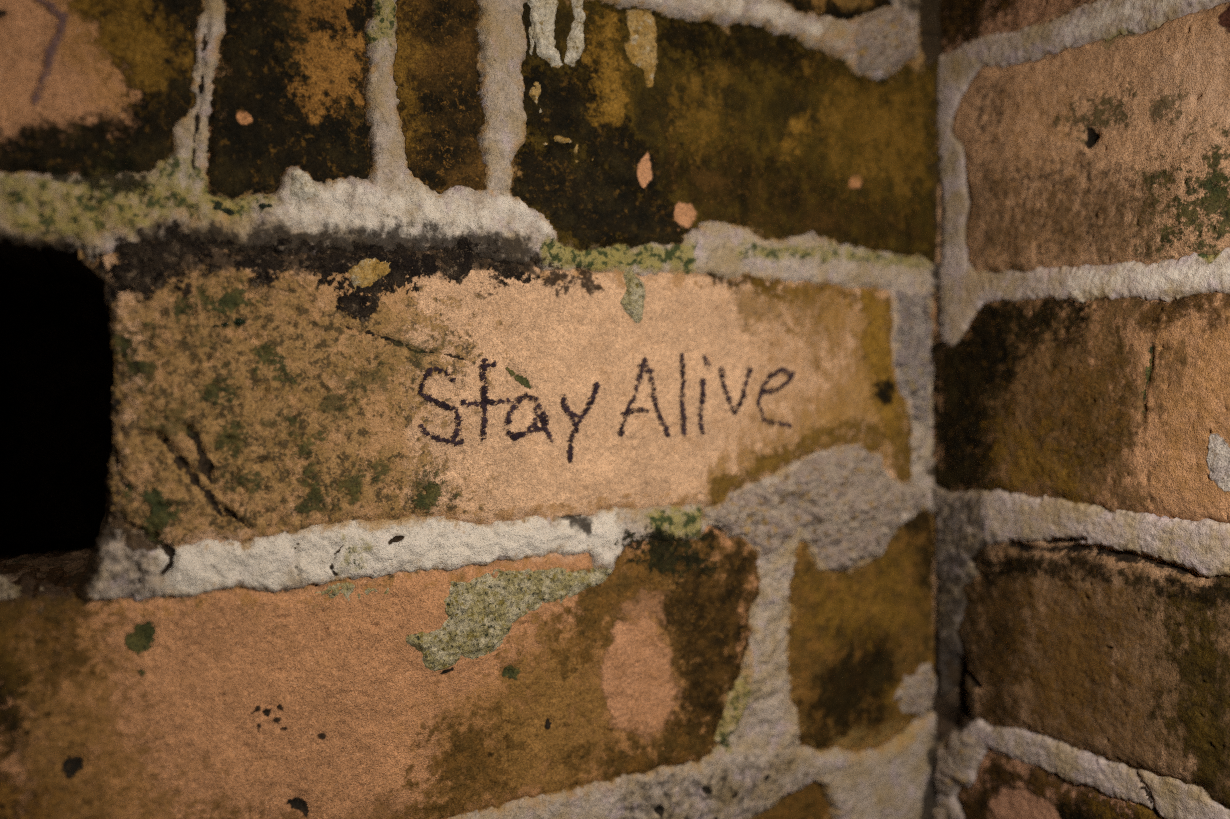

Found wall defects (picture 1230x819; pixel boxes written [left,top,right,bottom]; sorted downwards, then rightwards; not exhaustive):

water stain [511,0,1015,262]
spalling [0,246,167,630]
water stain [930,293,1230,513]
peeling [1207,434,1230,491]
water stain [399,525,760,819]